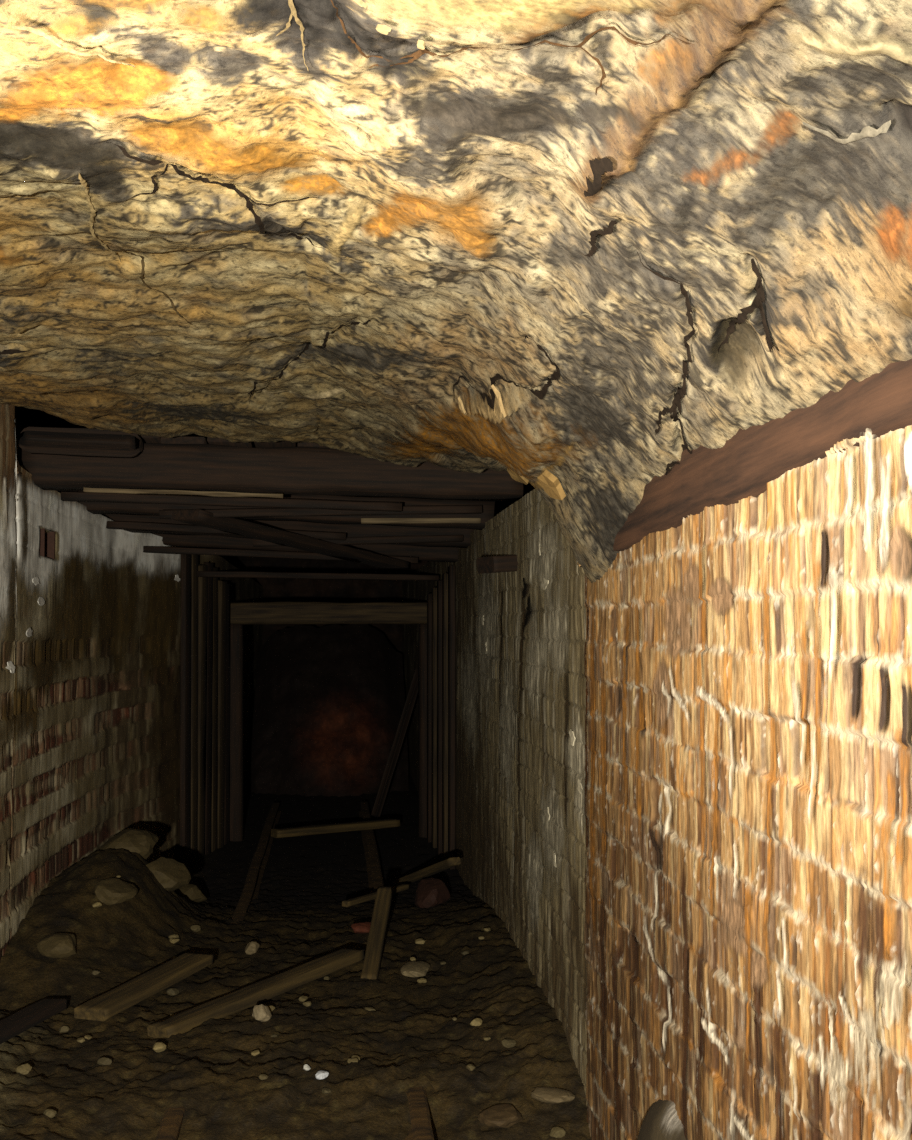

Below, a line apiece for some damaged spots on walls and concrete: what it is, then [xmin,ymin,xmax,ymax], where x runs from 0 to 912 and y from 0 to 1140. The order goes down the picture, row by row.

water stain [4,477,28,656]
water stain [0,553,180,822]